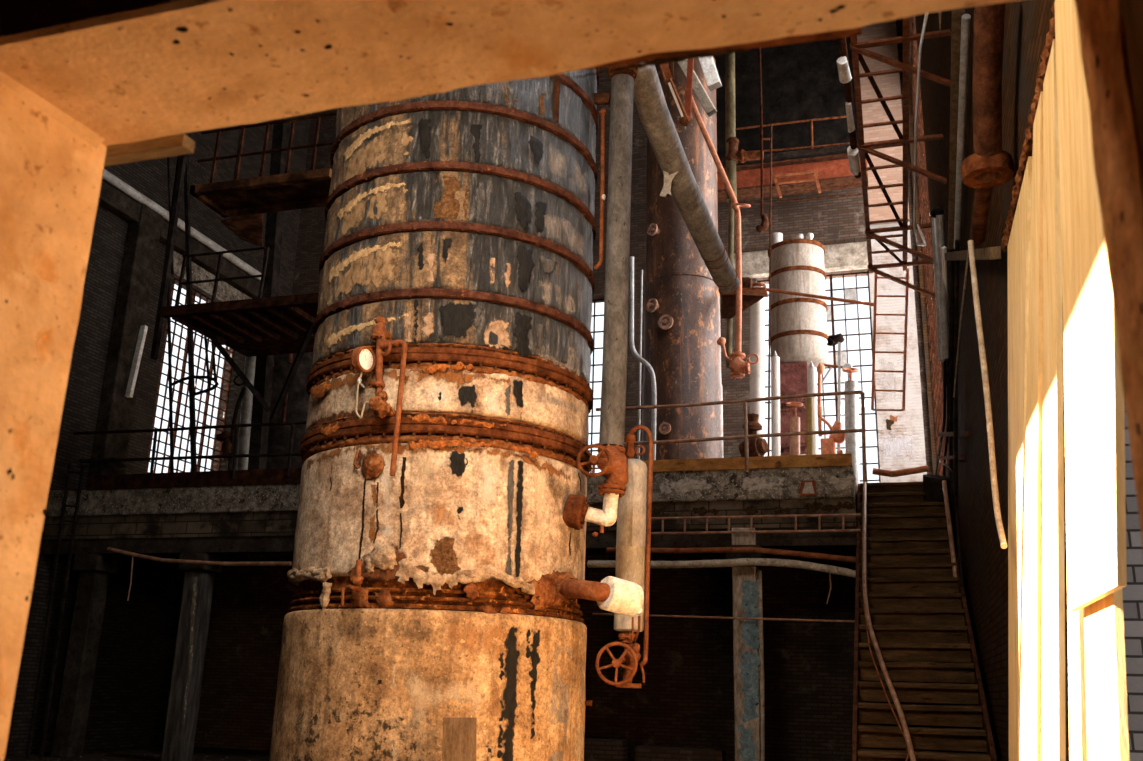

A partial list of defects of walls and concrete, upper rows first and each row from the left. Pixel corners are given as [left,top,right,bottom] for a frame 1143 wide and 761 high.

peeling [343,119,414,181]
peeling [489,257,511,288]
peeling [326,302,511,349]
corrosion [306,409,379,433]
corrosion [391,407,585,447]
corrosion [301,435,589,582]
peeling [352,545,397,609]
peeling [416,536,461,575]
peeling [529,569,566,610]
leakage [276,680,436,761]
leakage [485,627,541,761]
leakage [551,676,585,758]